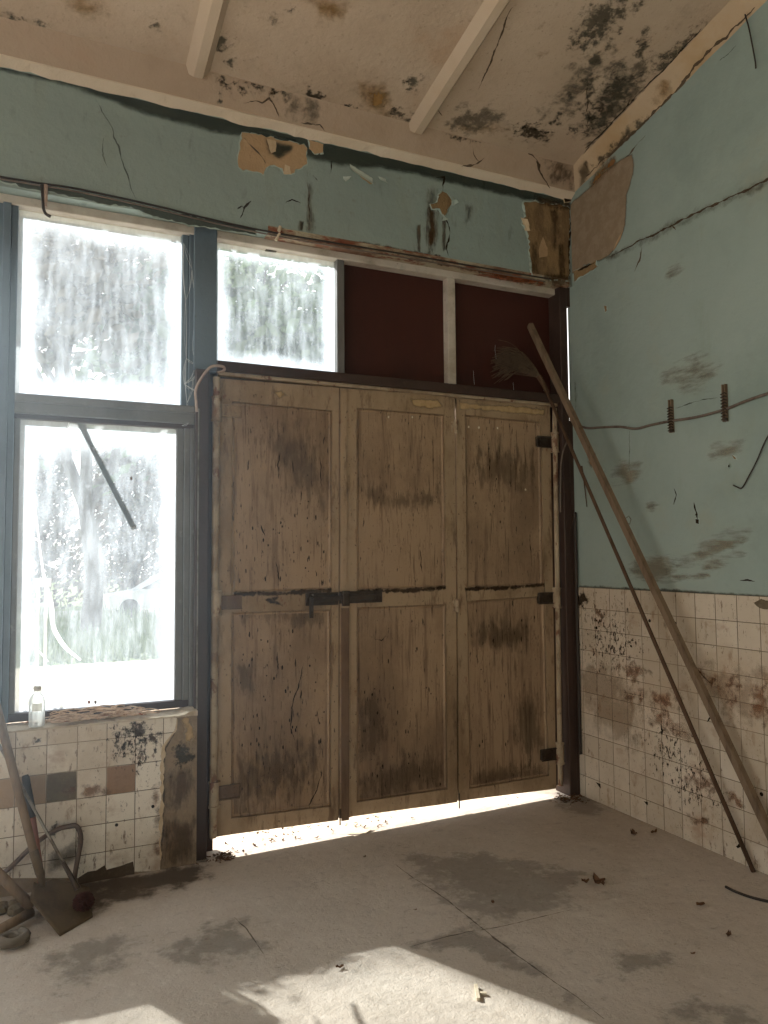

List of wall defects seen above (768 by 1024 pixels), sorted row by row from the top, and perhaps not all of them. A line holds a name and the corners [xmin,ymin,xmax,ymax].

crack [96,100,135,196]
leakage [216,36,285,94]
peeling [237,132,324,176]
leakage [1,68,565,204]
crack [479,7,513,88]
leakage [514,0,698,185]
spalling [430,190,459,221]
flaking render [521,155,634,282]